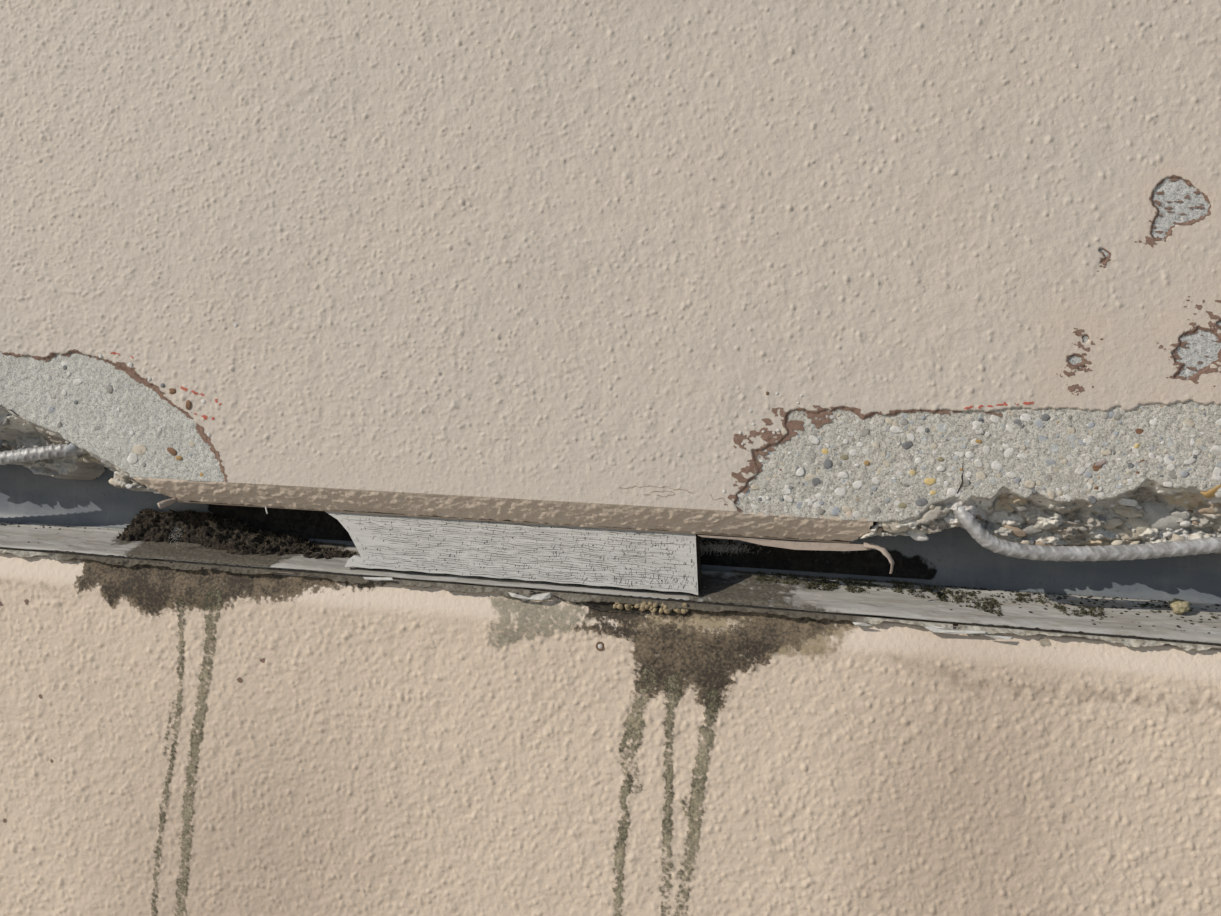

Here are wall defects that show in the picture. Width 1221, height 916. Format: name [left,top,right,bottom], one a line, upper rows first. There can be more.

peeling [1135,175,1211,247]
peeling [1156,296,1221,387]
spalling [0,349,227,509]
spalling [698,328,1221,574]
spalling [0,549,1221,651]
leakage [72,559,386,916]
leakage [489,597,855,916]